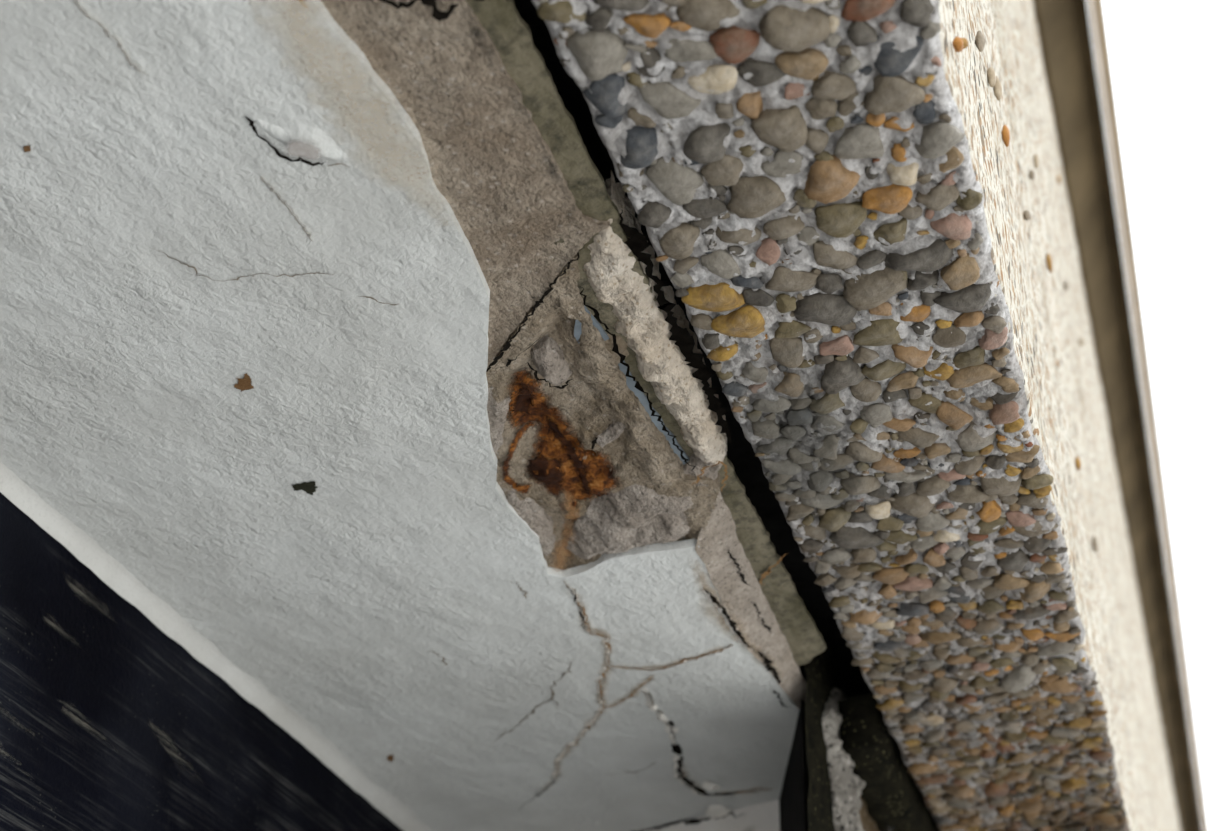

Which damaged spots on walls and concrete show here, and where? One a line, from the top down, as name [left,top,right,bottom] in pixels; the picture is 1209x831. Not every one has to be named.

peeling [320,0,727,570]
rust [502,370,619,567]
crack [496,550,787,831]